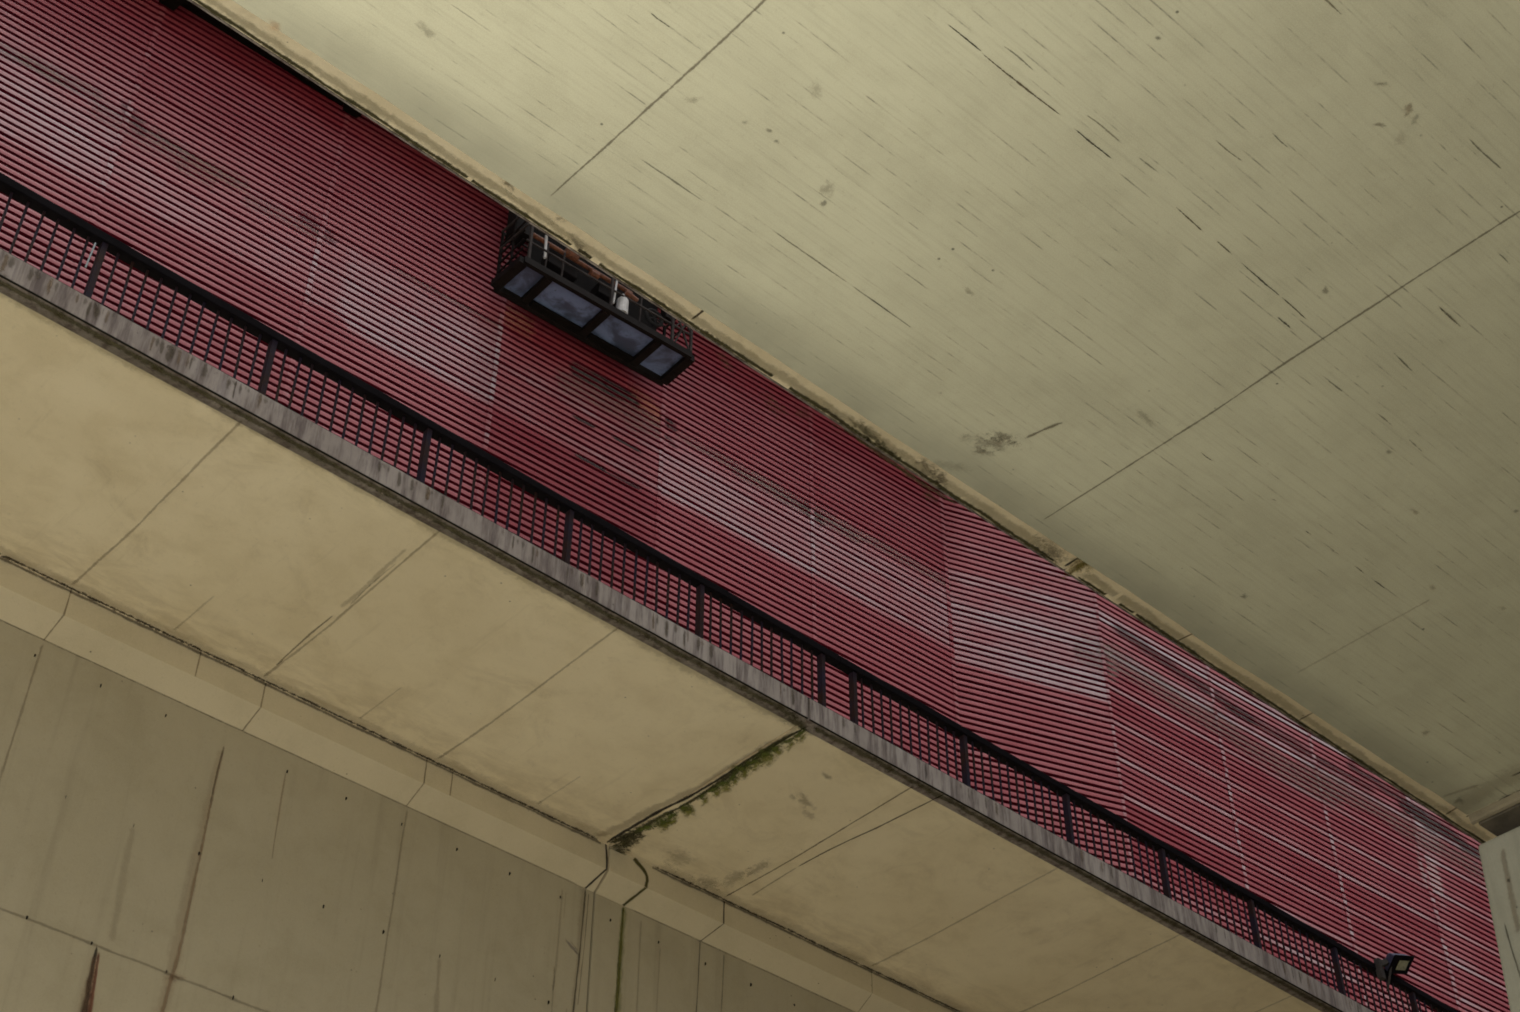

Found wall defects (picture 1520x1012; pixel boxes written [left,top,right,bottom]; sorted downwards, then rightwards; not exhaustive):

rust [81,948,99,1012]